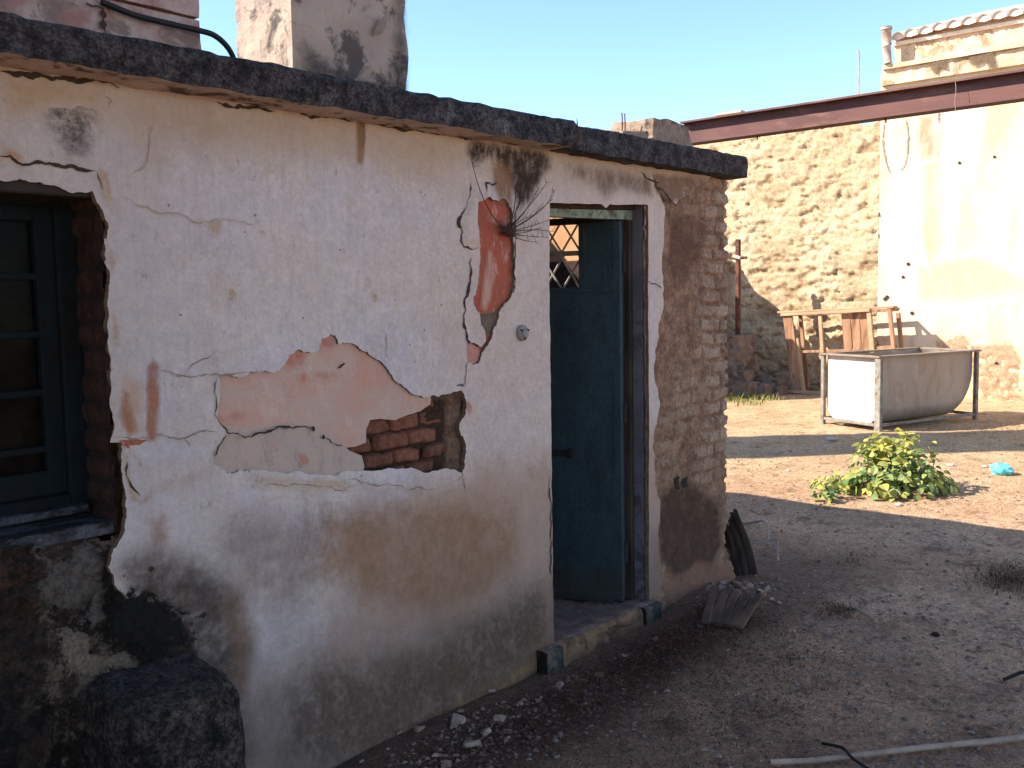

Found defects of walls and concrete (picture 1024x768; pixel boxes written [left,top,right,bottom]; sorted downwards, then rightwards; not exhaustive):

damp [364,0,407,90]
crack [1,155,103,188]
crack [127,127,259,225]
damp [0,66,705,212]
peeling [466,198,513,364]
peeling [213,335,474,501]
damp [287,468,532,638]
damp [661,489,733,604]
spalling [0,535,148,768]
damp [100,559,239,687]
damp [298,608,537,746]